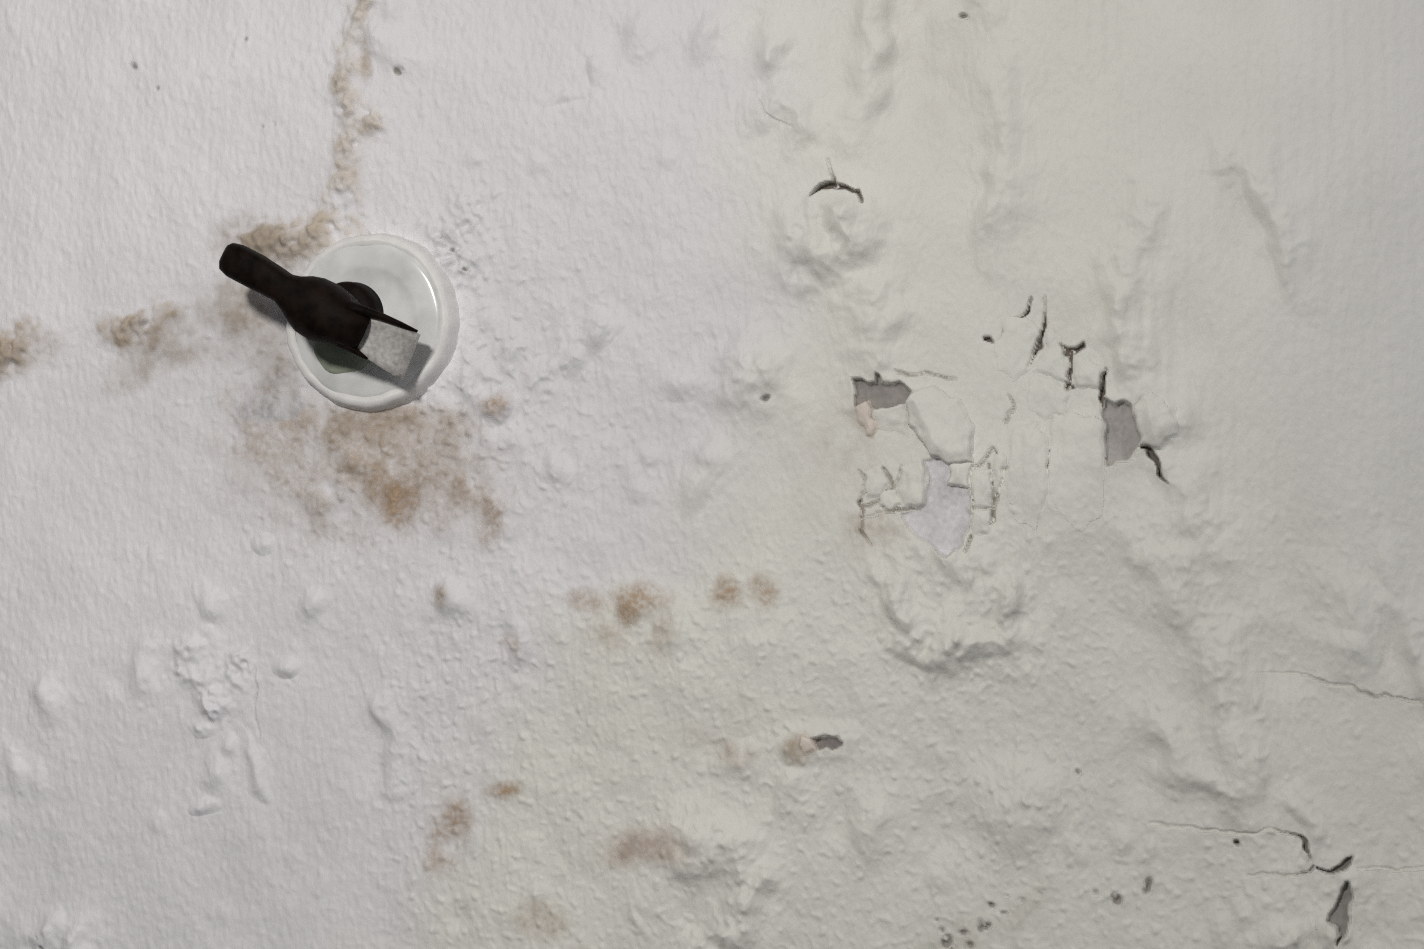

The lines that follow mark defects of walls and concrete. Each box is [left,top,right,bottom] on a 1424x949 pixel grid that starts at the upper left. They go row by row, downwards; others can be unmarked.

crack [809,160,864,203]
leakage [325,414,412,496]
peeling [851,317,1180,559]
crack [1149,823,1424,879]
peeling [1316,881,1354,949]